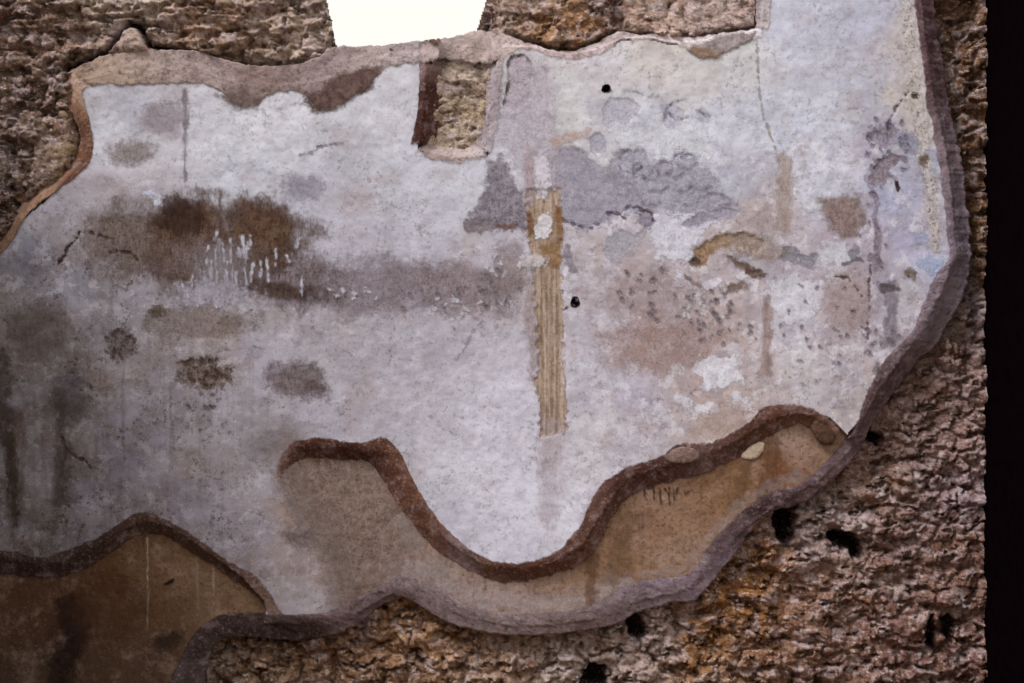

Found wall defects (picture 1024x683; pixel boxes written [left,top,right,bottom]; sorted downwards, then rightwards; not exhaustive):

crack [57,230,139,265]
water stain [83,89,537,380]
water stain [562,244,577,273]
spalling [673,232,818,346]
spalling [175,354,233,410]
water stain [0,354,21,526]
water stain [52,397,73,506]
peeling [275,457,420,605]
spalling [771,507,795,542]
spalling [826,529,860,557]
spalling [925,612,954,647]
spalling [579,662,607,683]